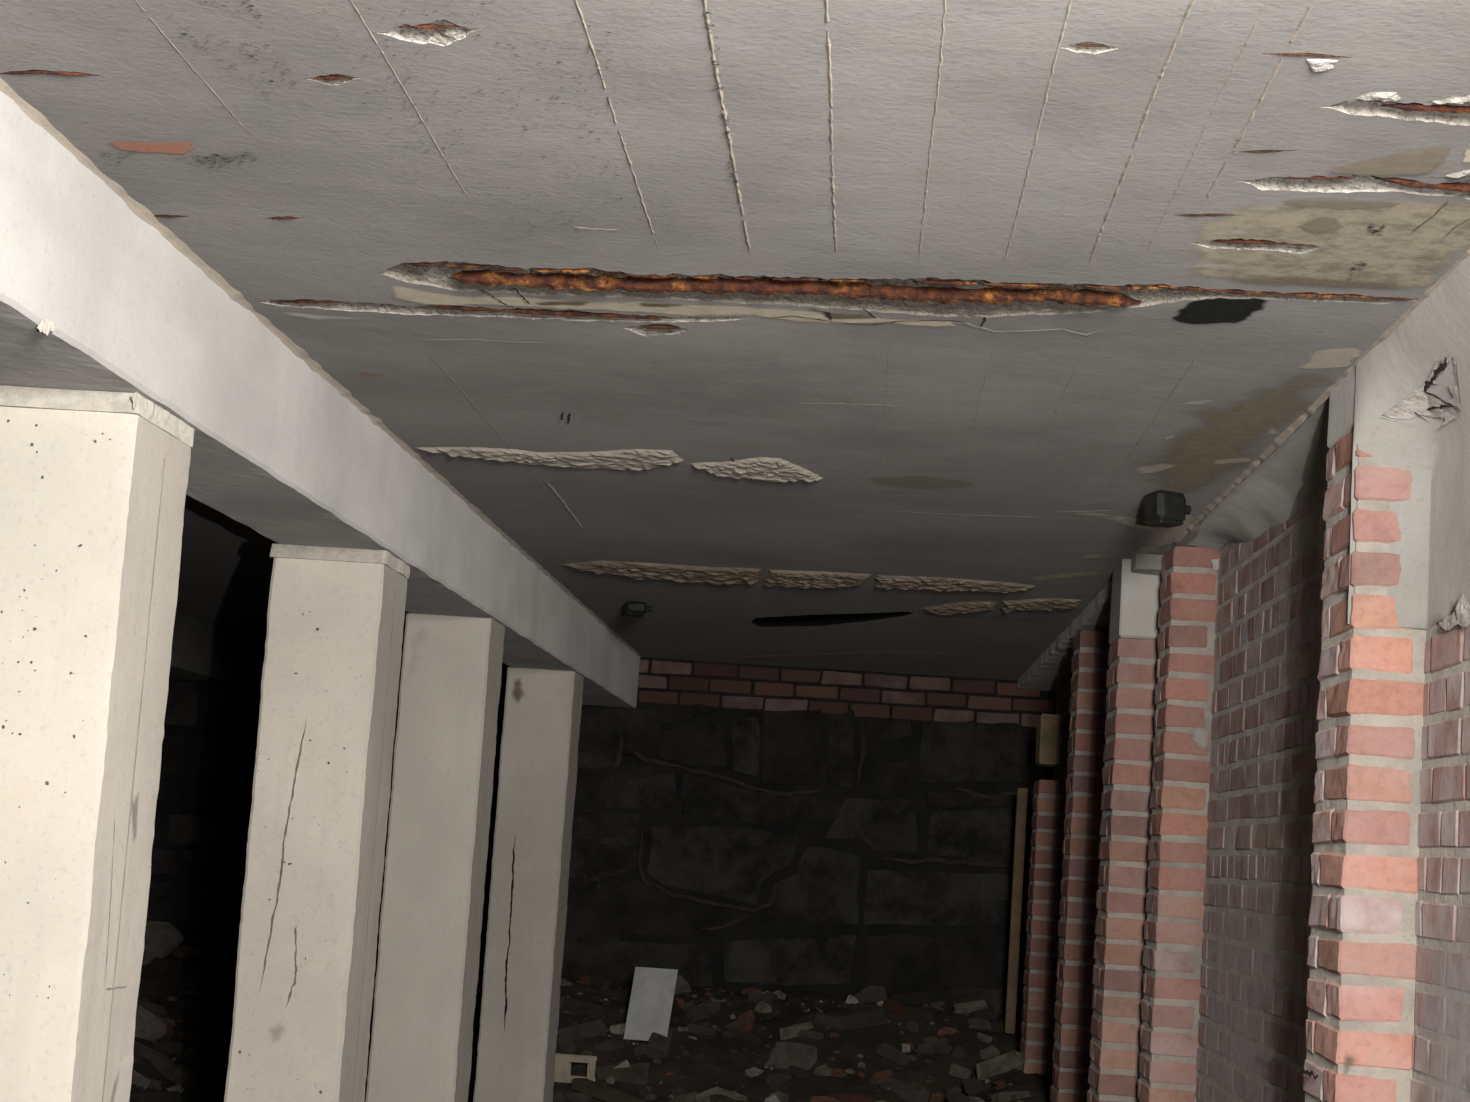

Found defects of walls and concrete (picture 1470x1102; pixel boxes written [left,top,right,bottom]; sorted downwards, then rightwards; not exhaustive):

spalling [166,3,622,231]
spalling [1321,92,1470,126]
spalling [1238,170,1470,200]
spalling [257,261,1417,337]
leakage [1173,199,1470,324]
crack [1414,358,1459,422]
crack [260,718,307,1007]
crack [504,843,515,1029]